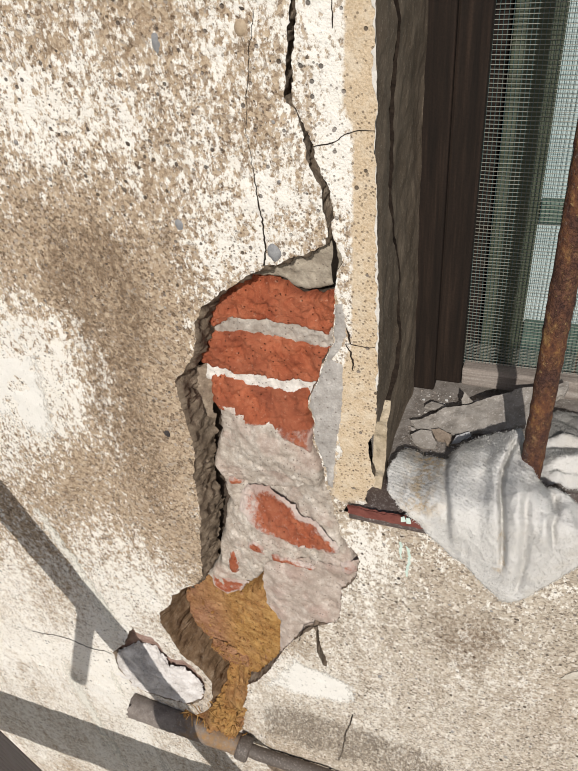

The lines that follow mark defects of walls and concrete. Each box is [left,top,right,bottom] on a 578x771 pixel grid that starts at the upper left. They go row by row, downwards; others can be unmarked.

flaking render [112,224,360,711]
crack [245,14,267,266]
crack [299,620,327,666]
crack [283,0,402,502]